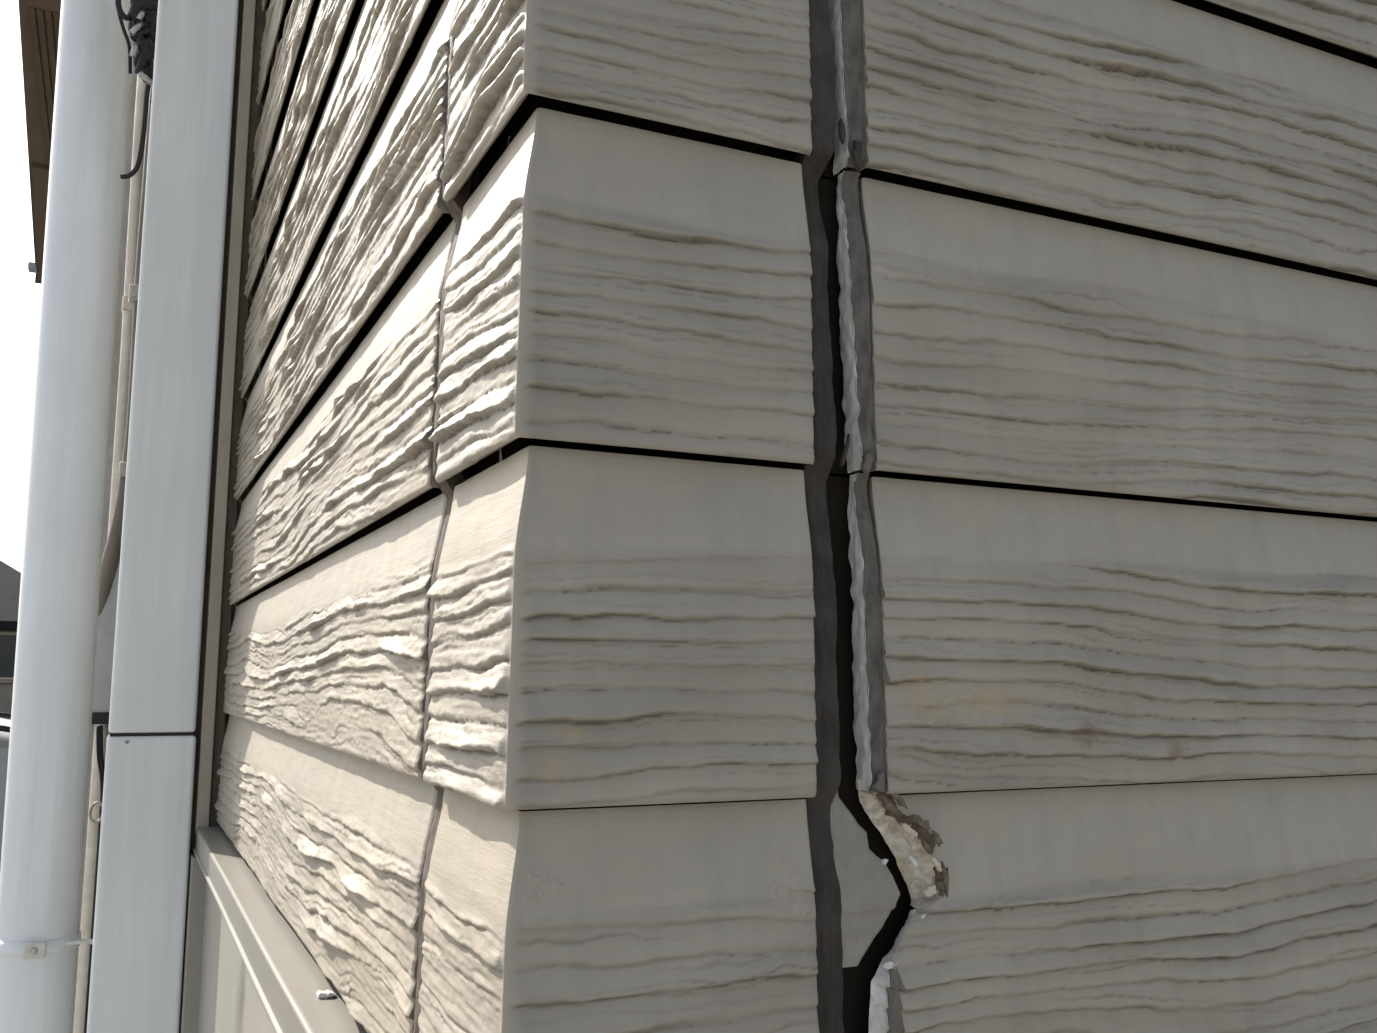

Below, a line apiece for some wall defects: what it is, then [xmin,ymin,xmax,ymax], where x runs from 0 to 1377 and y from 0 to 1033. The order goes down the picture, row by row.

crack [817,0,949,1033]